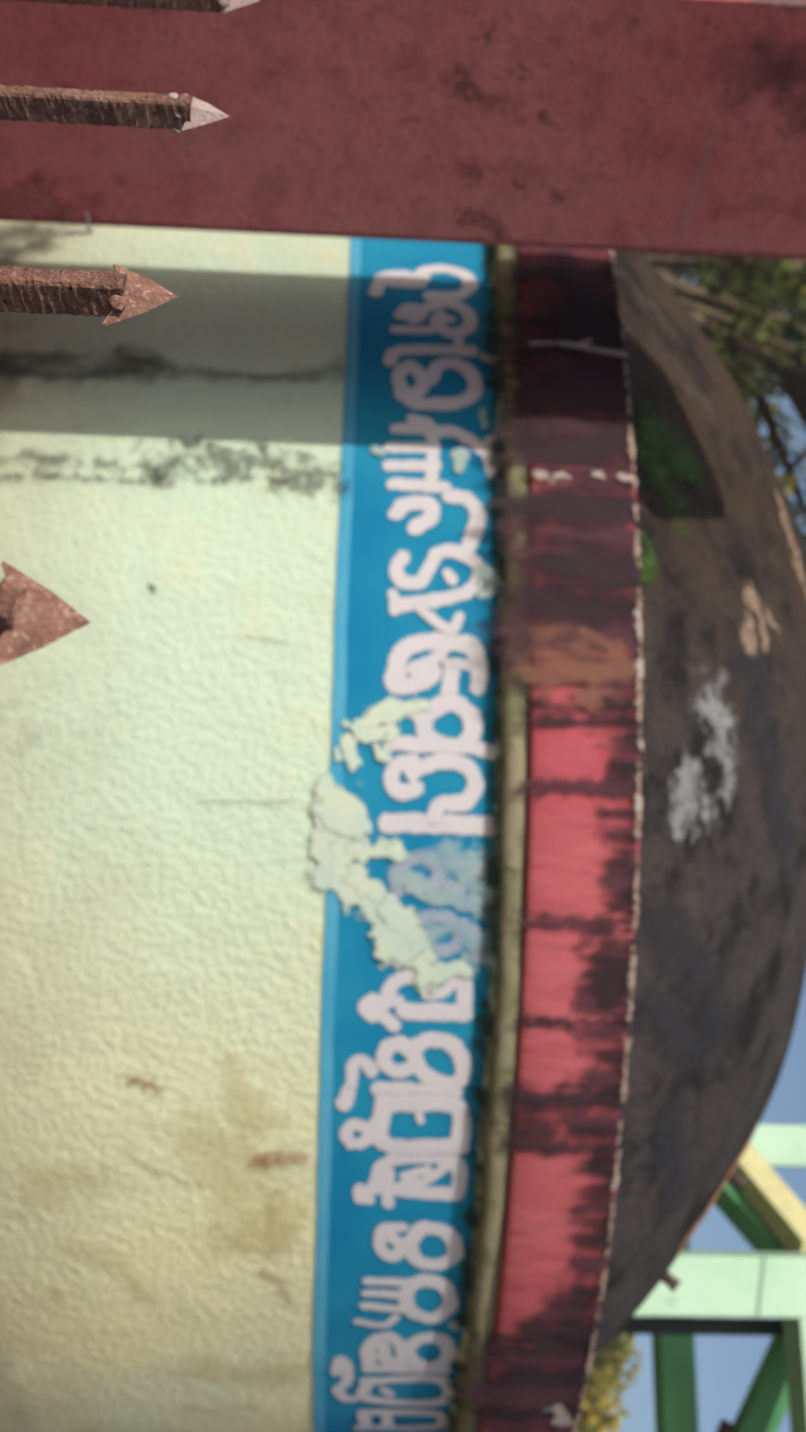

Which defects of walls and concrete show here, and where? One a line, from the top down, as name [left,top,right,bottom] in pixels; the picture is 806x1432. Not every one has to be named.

spalling [741,581,781,654]
peeling [307,695,500,993]